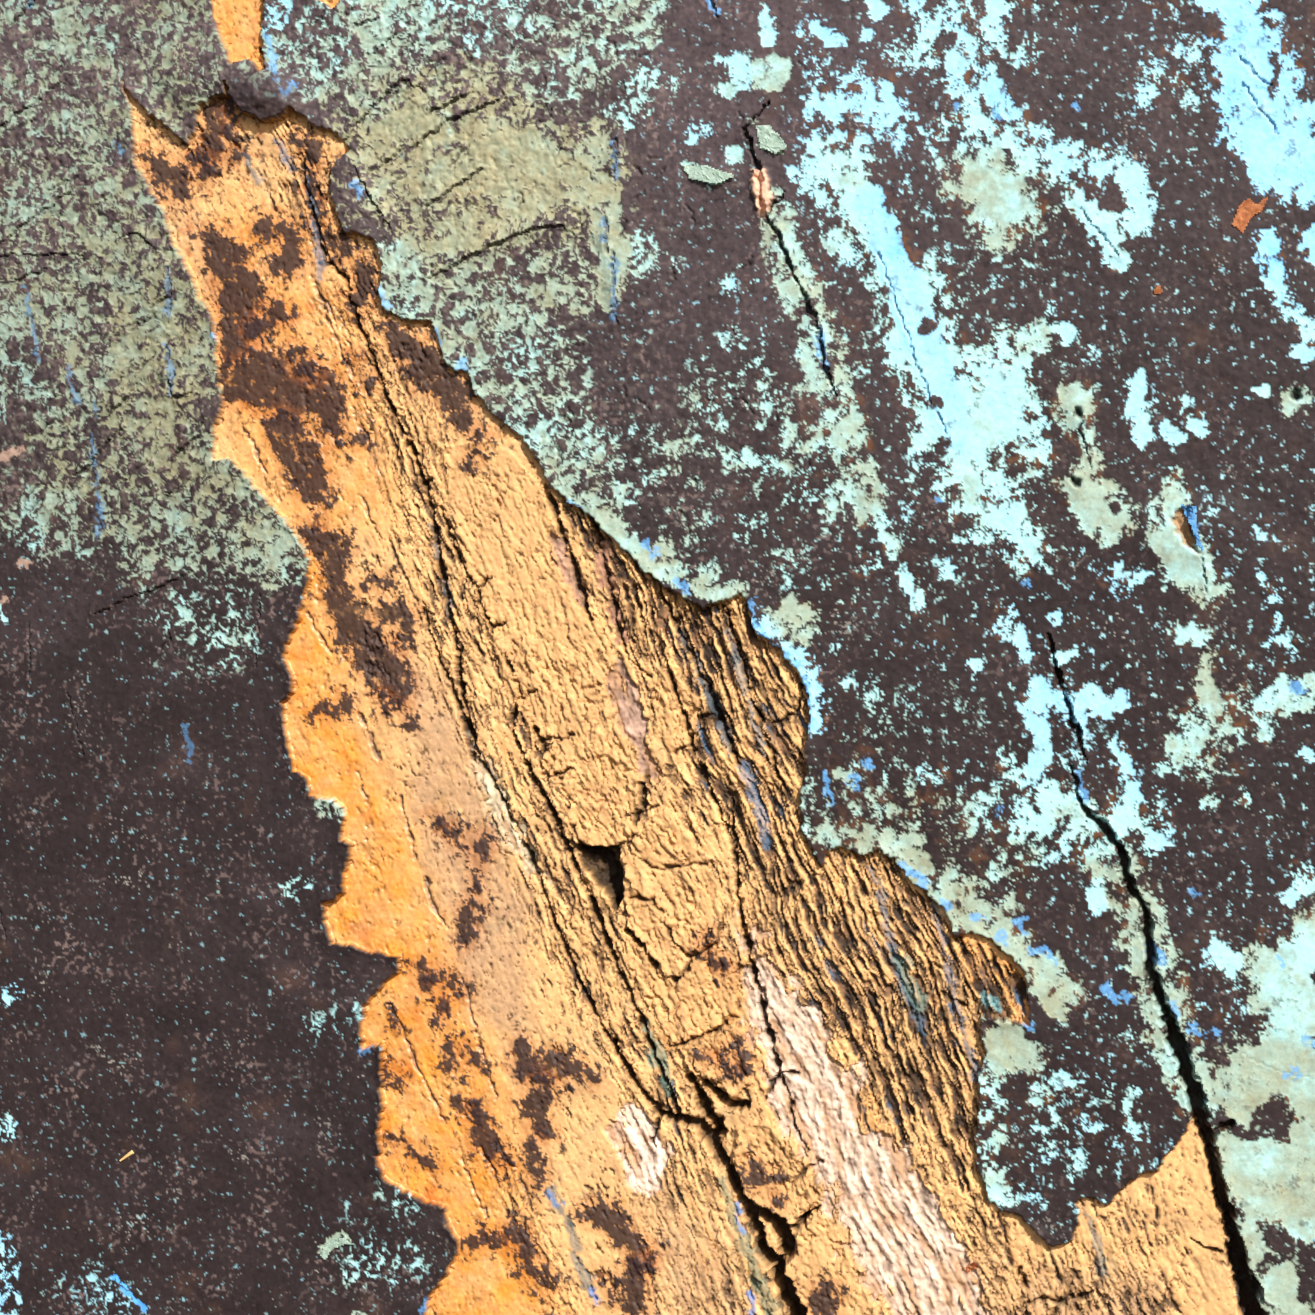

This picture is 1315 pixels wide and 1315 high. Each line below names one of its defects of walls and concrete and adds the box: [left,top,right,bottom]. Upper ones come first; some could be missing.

peeling [0,0,221,247]
peeling [0,165,308,589]
peeling [212,0,265,71]
peeling [260,0,755,609]
crack [297,153,819,1315]
crack [612,137,620,179]
peeling [128,96,1238,1315]
crack [741,100,771,171]
crack [758,191,838,398]
peeling [681,0,1315,811]
peeling [808,675,1315,1315]
crack [1047,634,1315,1315]